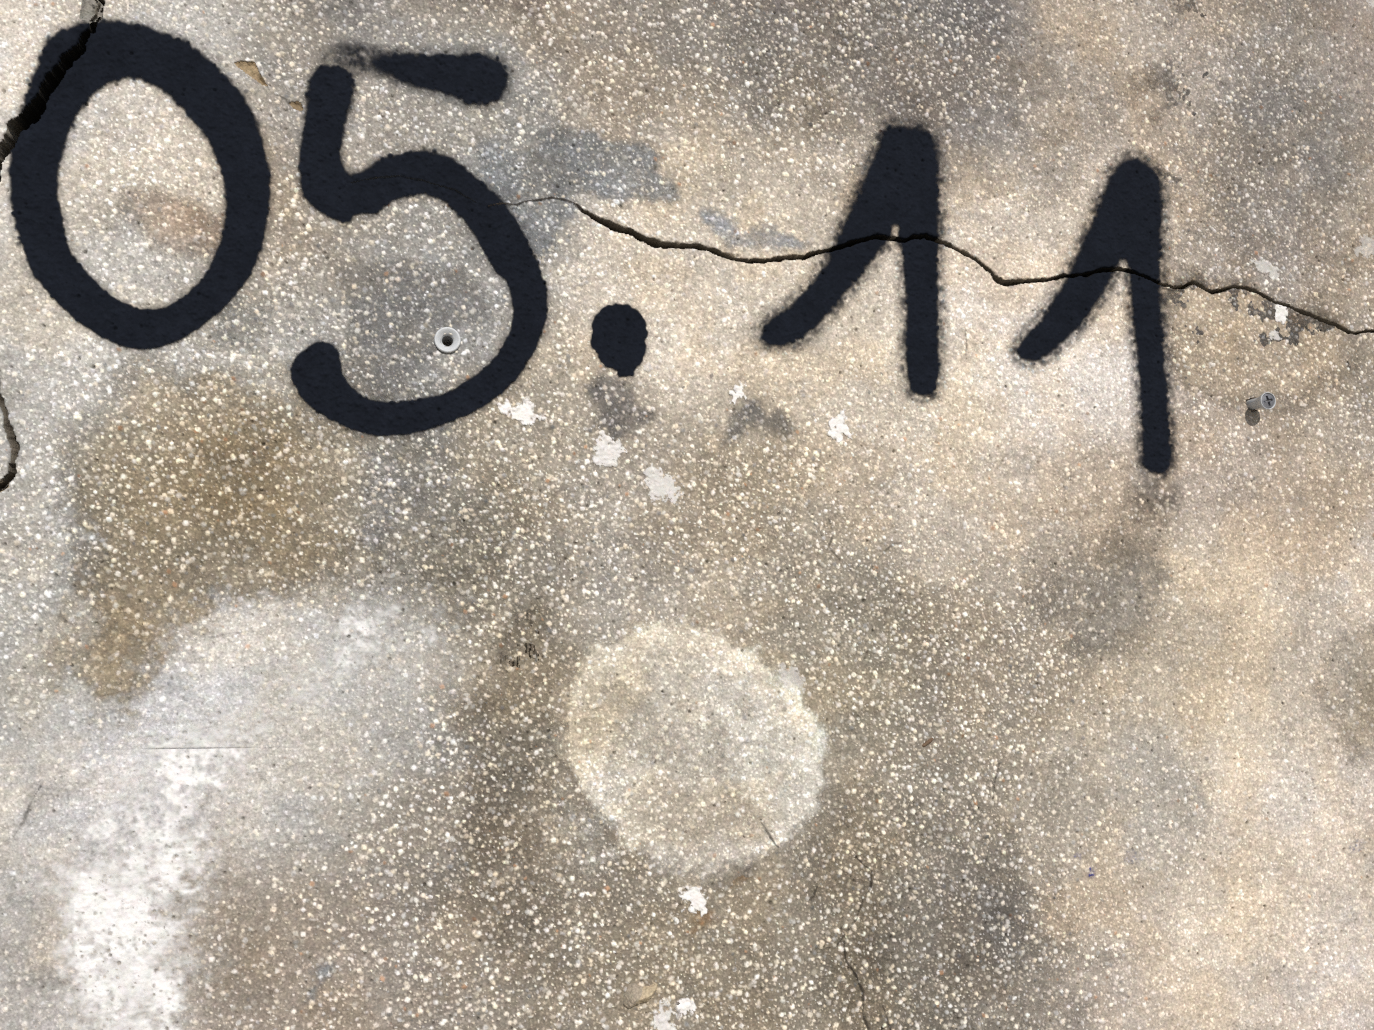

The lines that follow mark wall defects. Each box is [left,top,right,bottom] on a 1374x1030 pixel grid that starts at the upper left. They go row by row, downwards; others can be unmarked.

crack [0,0,105,182]
crack [351,176,1374,335]
crack [0,394,20,490]
leakage [41,713,268,1030]